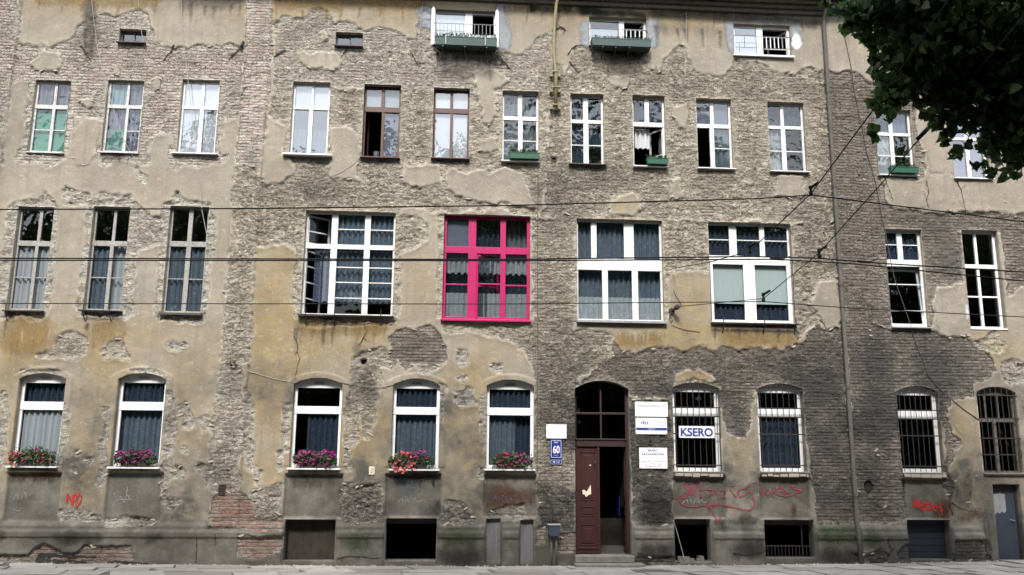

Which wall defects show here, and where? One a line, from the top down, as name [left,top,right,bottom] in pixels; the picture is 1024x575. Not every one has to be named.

spalling [0,0,855,545]
spalling [829,69,1024,524]
spalling [0,544,134,564]
spalling [557,532,576,554]
spalling [852,544,911,564]
spalling [953,539,992,562]